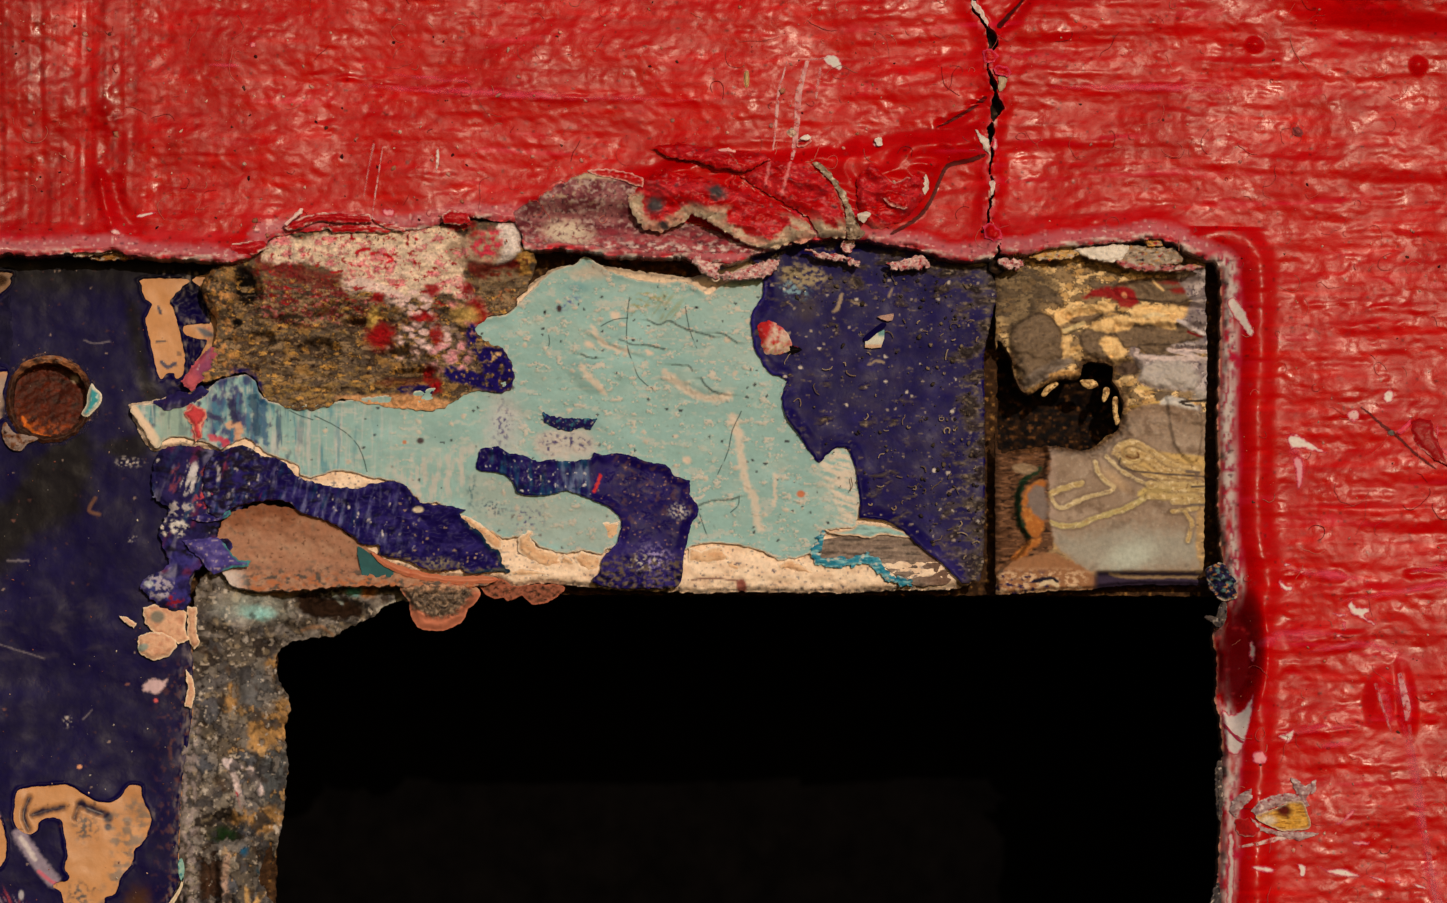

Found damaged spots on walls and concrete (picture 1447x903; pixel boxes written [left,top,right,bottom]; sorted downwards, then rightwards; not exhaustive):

spalling [73,229,134,262]
crack [890,0,1024,275]
peeling [120,134,1203,661]
peeling [185,670,195,708]